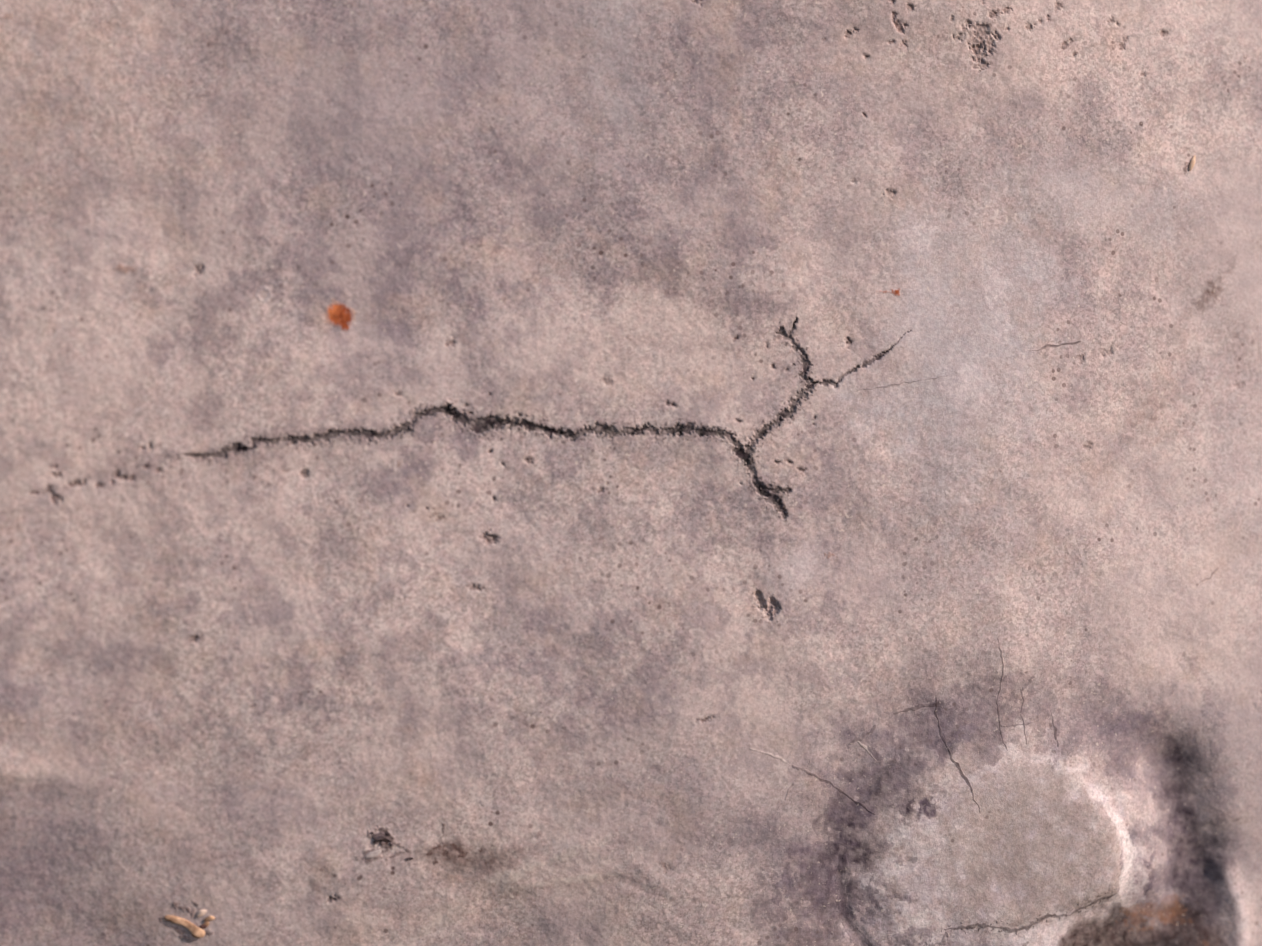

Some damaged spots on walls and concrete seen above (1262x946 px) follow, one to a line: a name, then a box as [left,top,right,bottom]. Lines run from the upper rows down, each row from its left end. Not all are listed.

corrosion [320,297,358,333]
crack [158,314,951,524]
crack [996,638,1059,751]
crack [848,697,981,813]
leakage [730,649,1262,946]